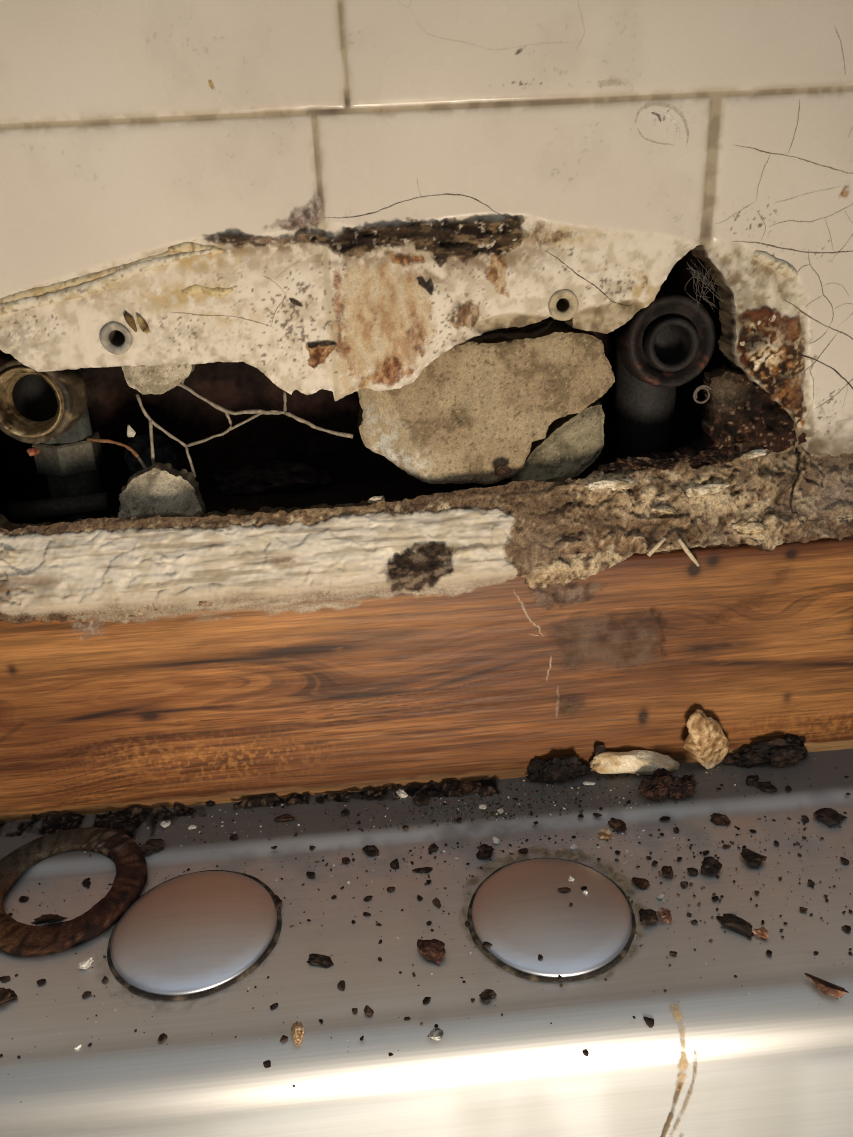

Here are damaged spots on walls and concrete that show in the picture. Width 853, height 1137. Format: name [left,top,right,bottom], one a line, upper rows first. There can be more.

crack [736,103,847,173]
rust [334,252,431,388]
rust [448,301,479,329]
rust [485,253,507,294]
crack [734,191,853,408]
spalling [0,350,14,366]
spalling [306,343,339,368]
spalling [572,250,807,491]
rust [737,307,807,430]
spalling [0,362,512,524]
peeling [684,484,729,497]
spalling [388,542,454,592]